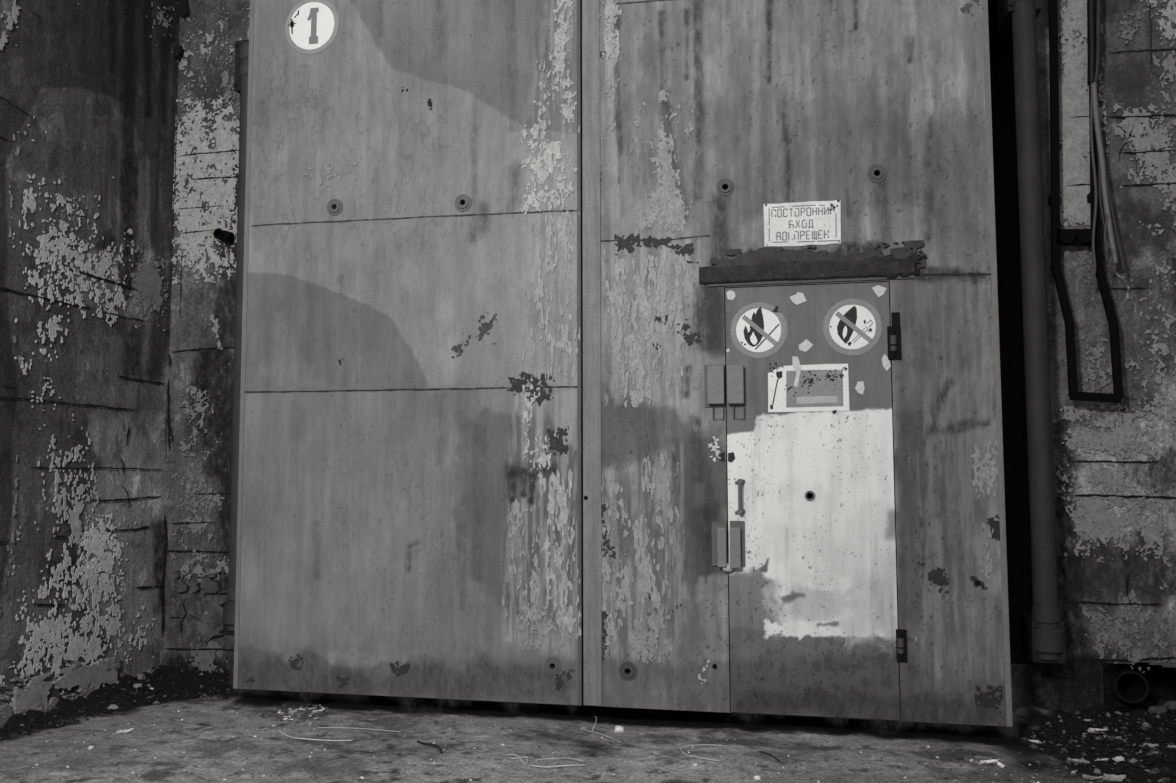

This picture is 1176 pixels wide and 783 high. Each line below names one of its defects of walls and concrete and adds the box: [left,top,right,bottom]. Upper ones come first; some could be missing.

peeling [9,2,250,375]
peeling [1053,0,1176,567]
peeling [31,377,61,411]
peeling [0,414,160,726]
peeling [164,379,229,596]
peeling [182,635,229,674]
peeling [1082,589,1176,673]